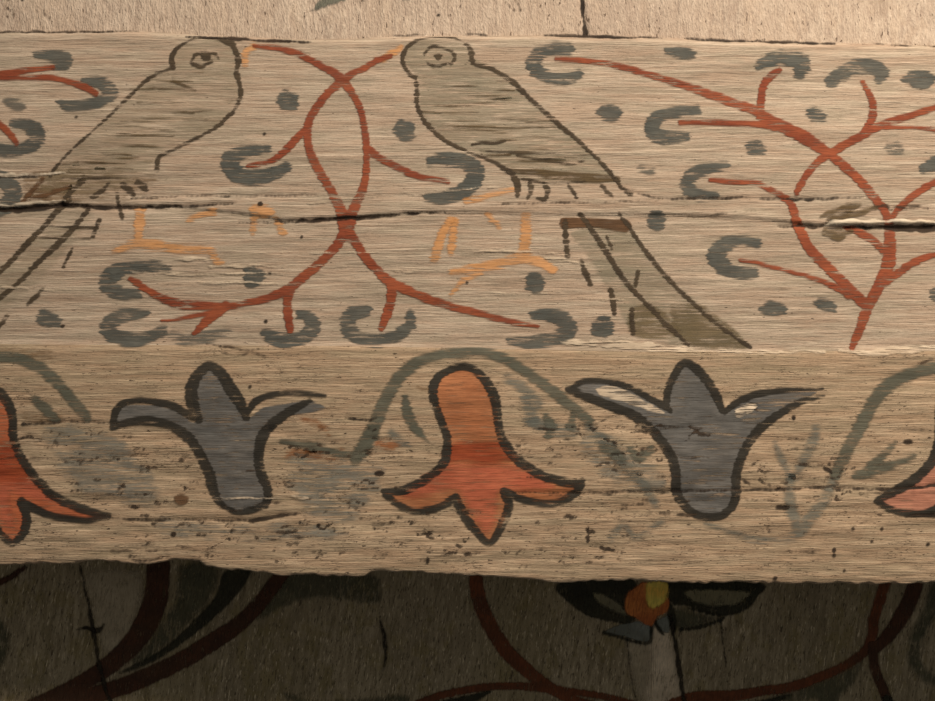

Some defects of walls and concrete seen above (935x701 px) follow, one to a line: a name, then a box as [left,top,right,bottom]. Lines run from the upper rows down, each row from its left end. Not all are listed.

crack [544,0,655,39]
crack [0,27,121,35]
crack [186,35,310,43]
crack [686,36,835,44]
crack [0,171,118,179]
crack [0,194,233,213]
crack [246,195,437,223]
crack [466,185,585,204]
crack [620,193,935,241]
crack [79,566,112,701]